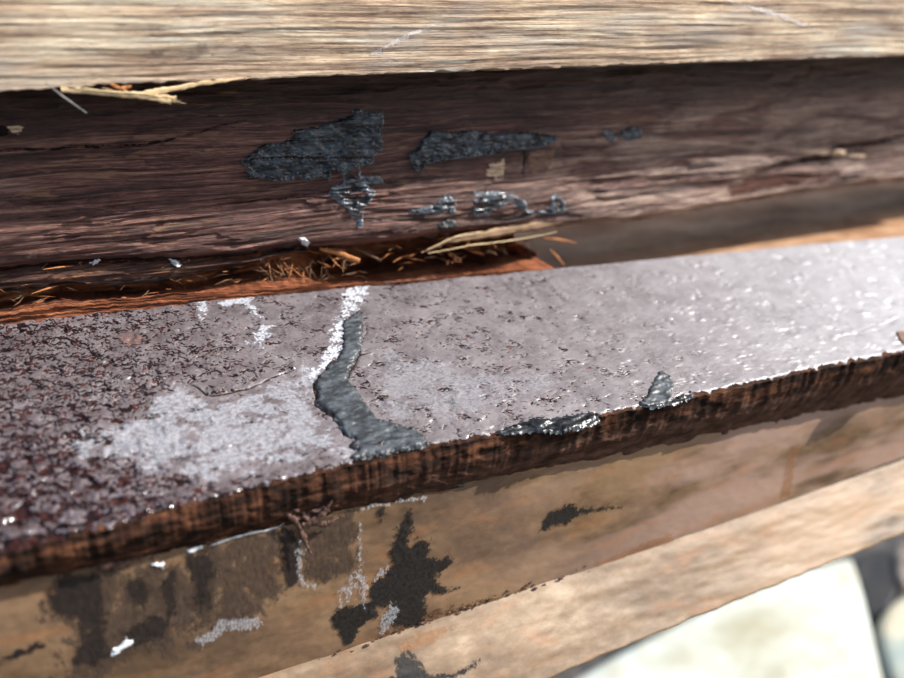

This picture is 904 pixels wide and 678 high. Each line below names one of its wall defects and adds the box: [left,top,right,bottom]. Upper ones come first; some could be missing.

peeling [242,108,385,228]
peeling [408,129,559,179]
peeling [407,193,458,231]
peeling [473,191,566,217]
efflorescence [218,298,273,349]
efflorescence [307,286,369,379]
peeling [313,311,429,462]
peeling [639,369,695,410]
peeling [495,411,601,436]